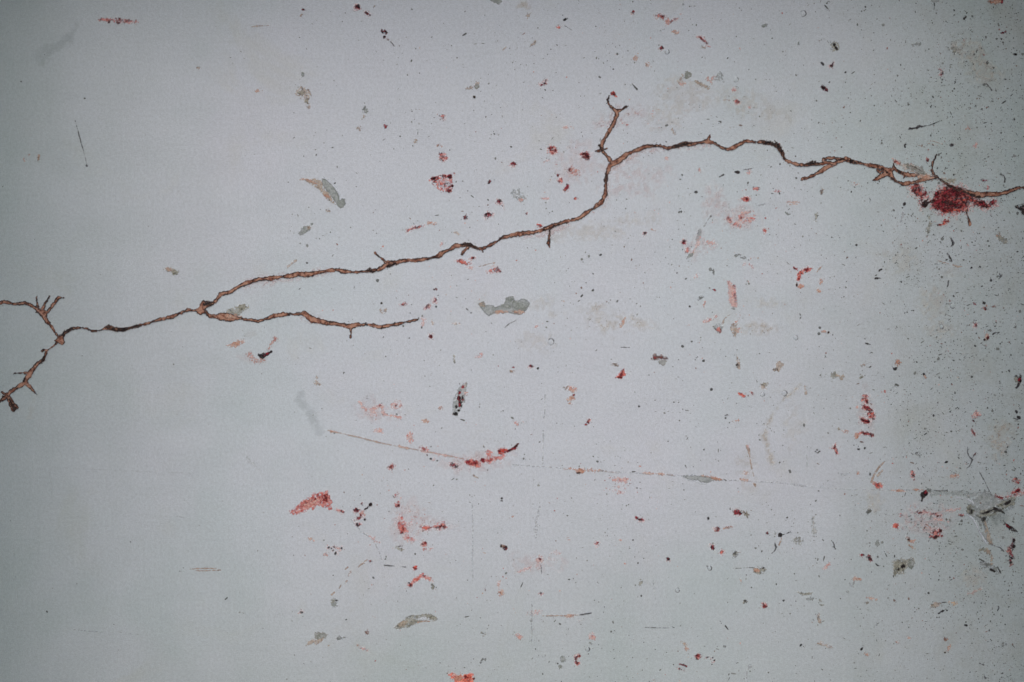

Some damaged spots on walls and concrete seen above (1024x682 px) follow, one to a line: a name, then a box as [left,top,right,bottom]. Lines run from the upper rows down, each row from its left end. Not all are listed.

peeling [300,176,346,212]
corrosion [909,183,997,251]
crack [0,95,1024,412]
peeling [478,296,530,326]